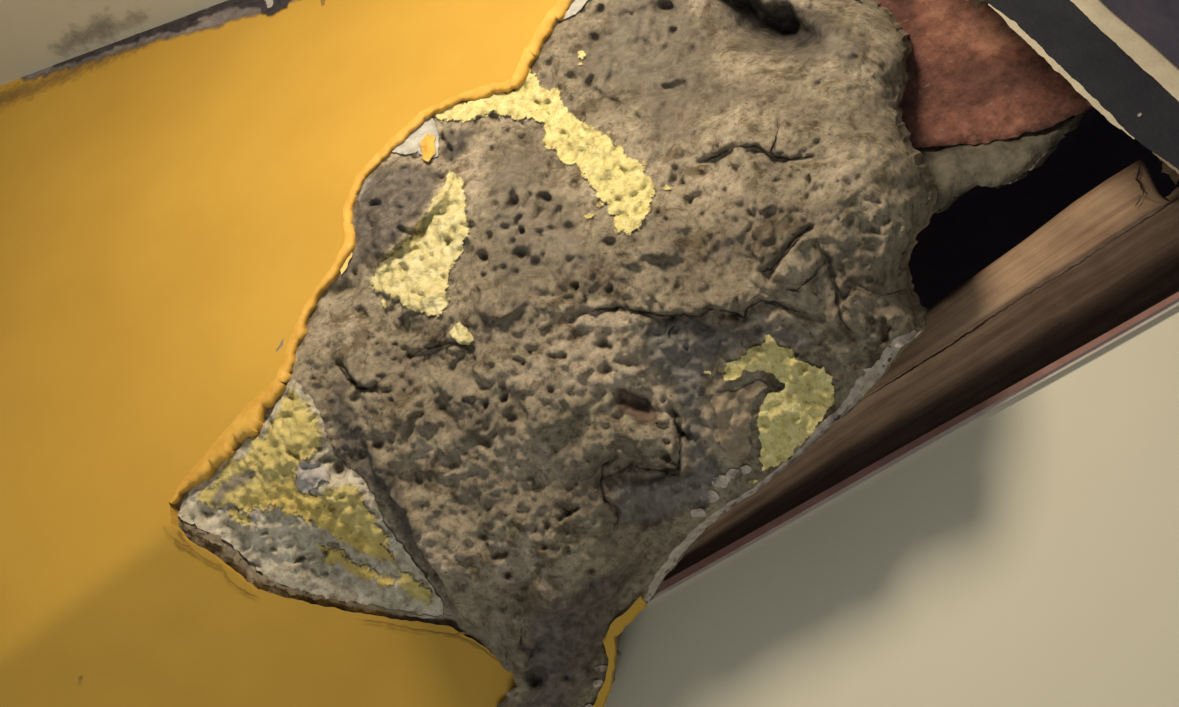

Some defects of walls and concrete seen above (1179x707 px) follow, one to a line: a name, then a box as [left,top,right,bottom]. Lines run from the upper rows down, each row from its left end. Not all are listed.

water stain [0,0,292,102]
crack [700,122,811,162]
spalling [908,4,1179,309]
crack [579,226,906,336]
crack [339,366,389,392]
crack [414,325,472,355]
flaking render [169,0,938,707]
crack [559,410,691,528]